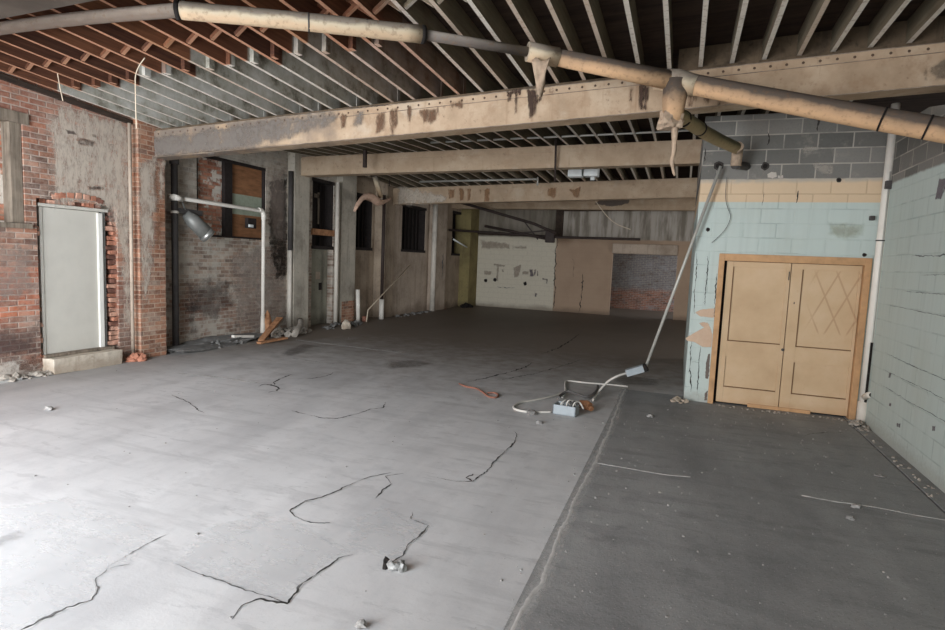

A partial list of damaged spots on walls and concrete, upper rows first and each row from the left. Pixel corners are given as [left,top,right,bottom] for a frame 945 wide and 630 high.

peeling [36,107,165,345]
leakage [0,333,41,376]
peeling [686,308,714,379]
crack [437,431,517,482]
crack [289,473,402,524]
crack [393,513,429,562]
crack [21,535,165,630]
crack [180,554,353,620]